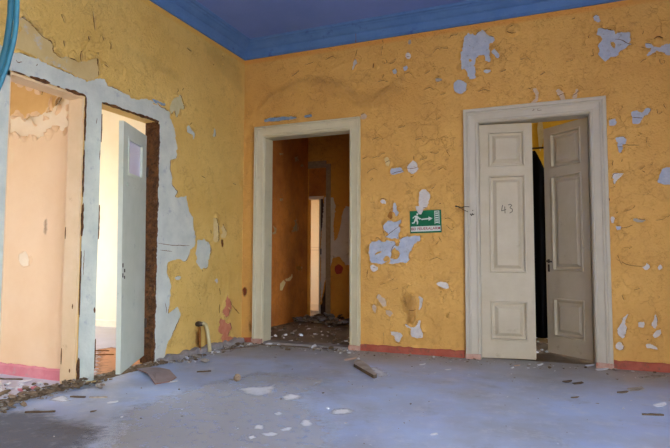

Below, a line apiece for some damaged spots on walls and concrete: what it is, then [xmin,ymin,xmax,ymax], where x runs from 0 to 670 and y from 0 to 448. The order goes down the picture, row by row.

peeling [454,28,500,96]
peeling [590,13,670,63]
peeling [628,106,655,124]
flaking render [0,9,228,383]
peeling [365,198,424,273]
spalling [214,276,238,342]
peeling [389,290,427,343]
peeling [613,311,663,353]